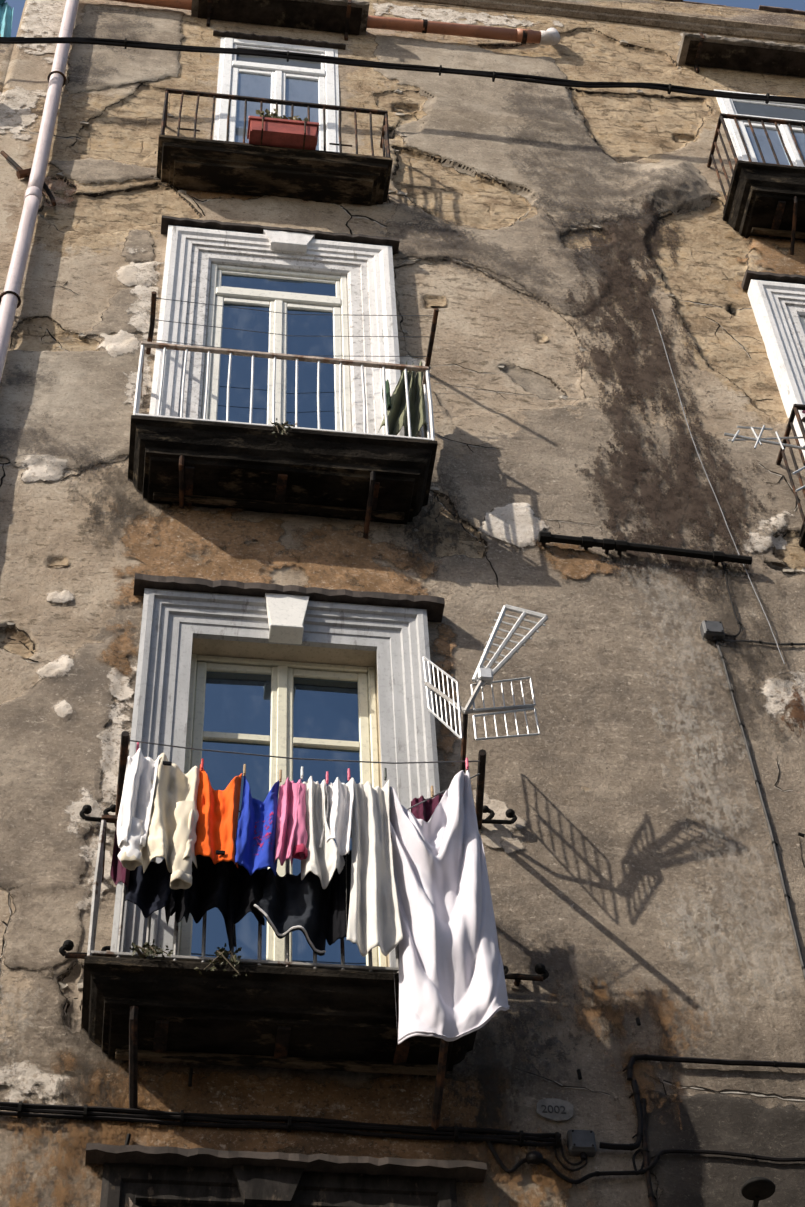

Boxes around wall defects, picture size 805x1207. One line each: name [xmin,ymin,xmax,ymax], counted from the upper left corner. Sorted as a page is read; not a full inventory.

peeling [0,86,47,140]
crack [332,203,388,235]
crack [395,159,533,231]
crack [397,257,522,290]
spalling [10,316,100,352]
peeling [123,248,164,406]
spalling [0,621,36,659]
peeling [64,645,137,910]
spalling [57,961,84,1034]
peeling [0,1050,84,1106]
crack [650,1076,805,1101]